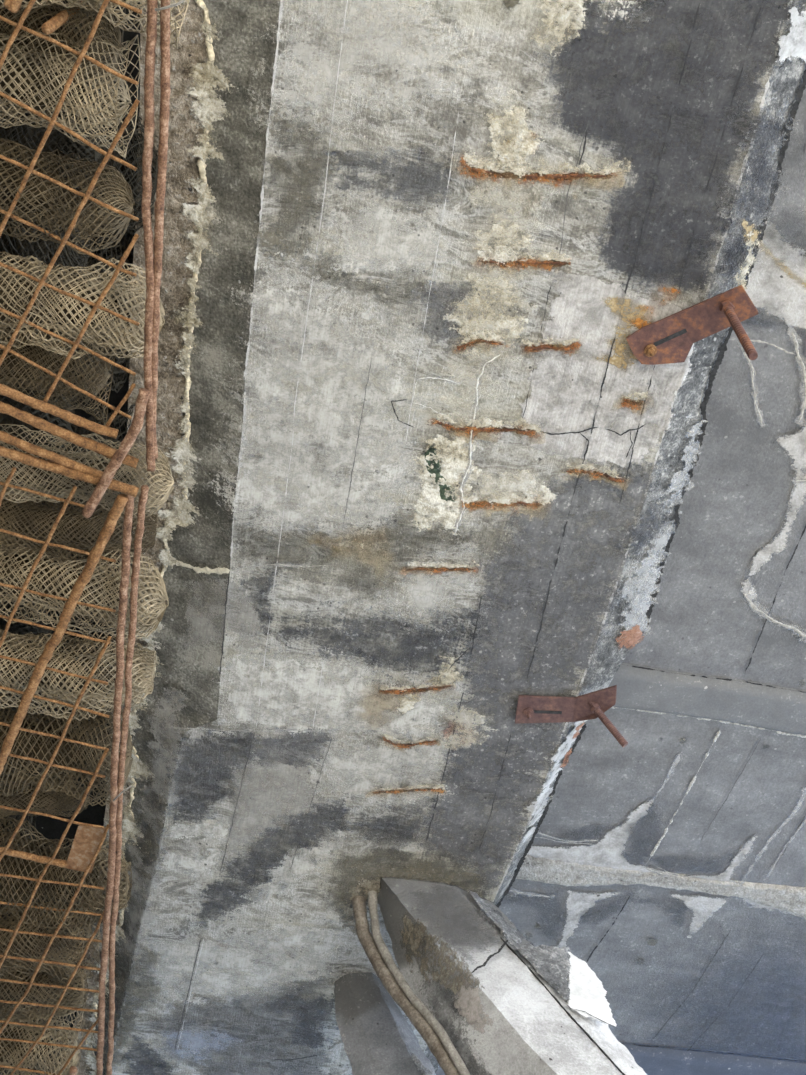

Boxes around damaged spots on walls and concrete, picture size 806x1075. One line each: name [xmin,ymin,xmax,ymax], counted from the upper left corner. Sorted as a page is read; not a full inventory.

damp [533,0,586,56]
peeling [778,7,806,64]
spalling [457,152,619,187]
spalling [477,249,571,272]
damp [733,233,806,289]
spalling [454,329,582,355]
rust [595,297,652,370]
damp [105,0,239,889]
spalling [427,413,541,438]
rust [560,721,585,768]
damp [315,833,535,923]
damp [83,903,335,1075]